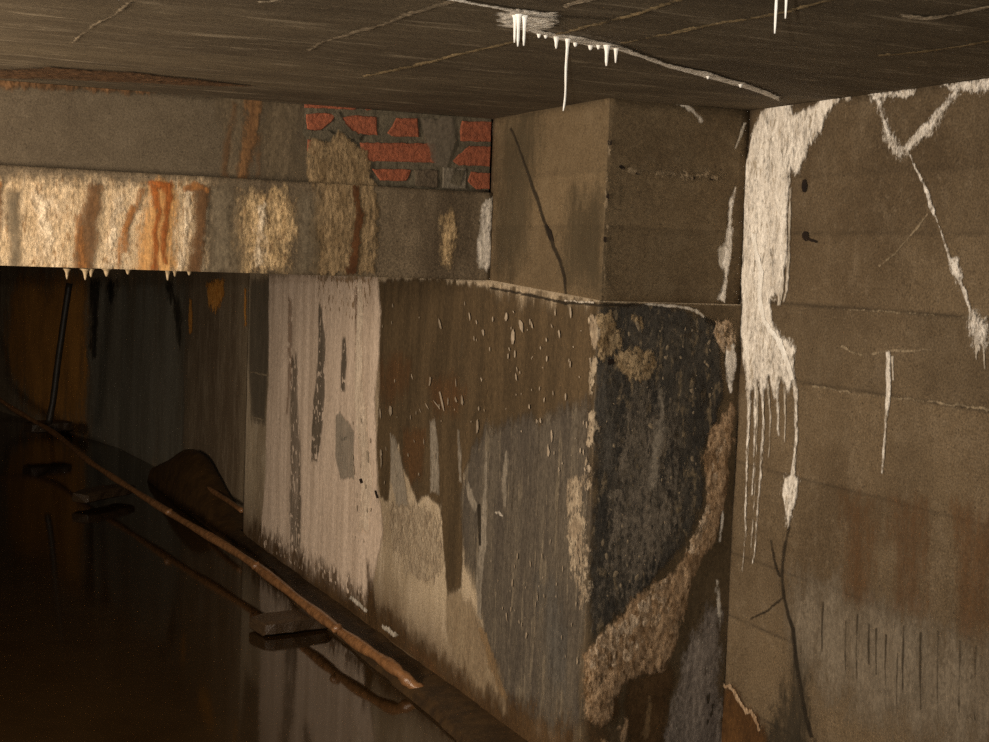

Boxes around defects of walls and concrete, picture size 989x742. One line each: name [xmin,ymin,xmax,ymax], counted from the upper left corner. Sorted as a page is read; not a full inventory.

crack [308,0,833,100]
corrosion [73,184,103,268]
corrosion [118,179,210,272]
corrosion [205,278,225,314]
spalling [302,104,492,191]
crack [490,128,716,325]
damp [869,78,989,363]
damp [0,97,850,742]
damp [841,345,916,473]
peeling [458,285,724,742]
crack [750,526,812,737]
damp [768,576,989,742]